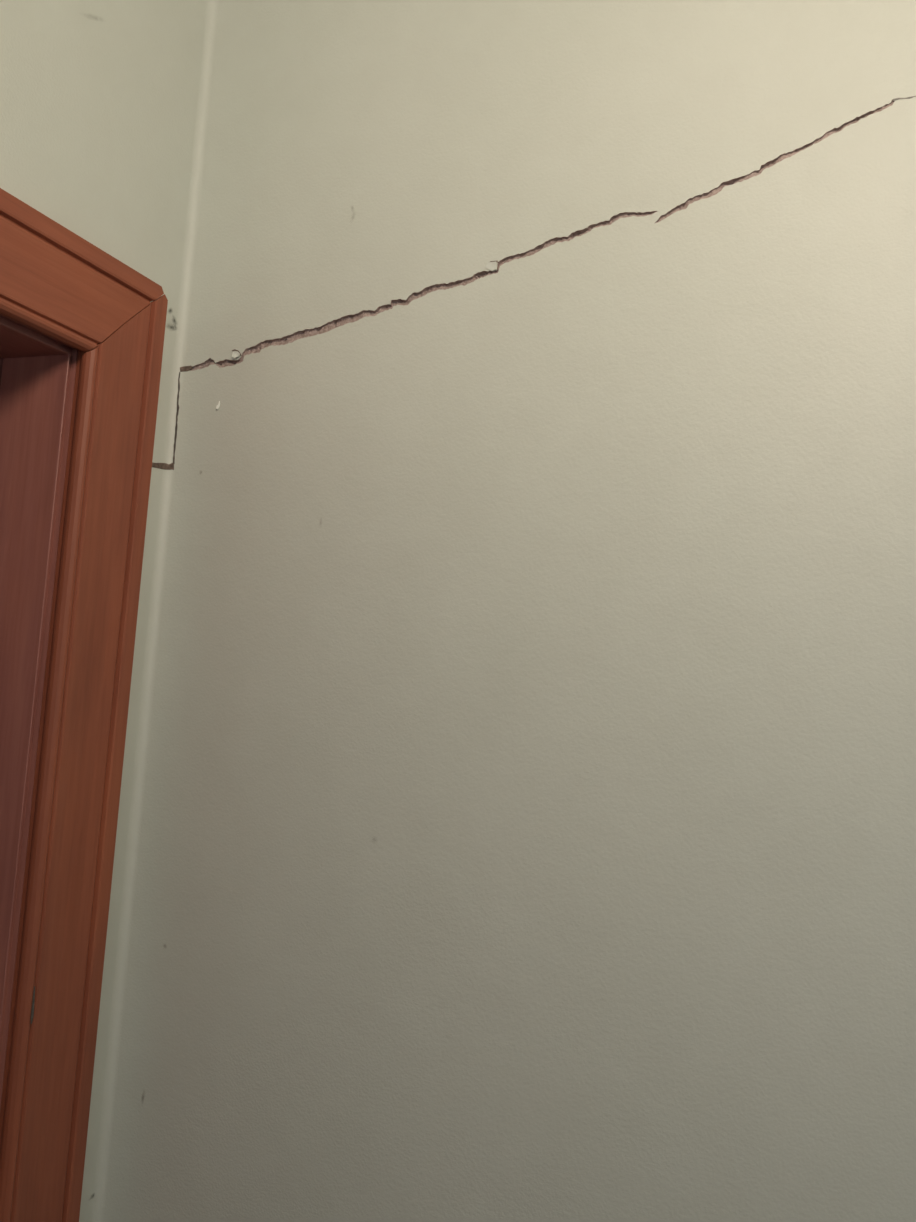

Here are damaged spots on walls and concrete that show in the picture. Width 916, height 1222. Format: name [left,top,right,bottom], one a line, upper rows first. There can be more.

crack [152,96,916,470]